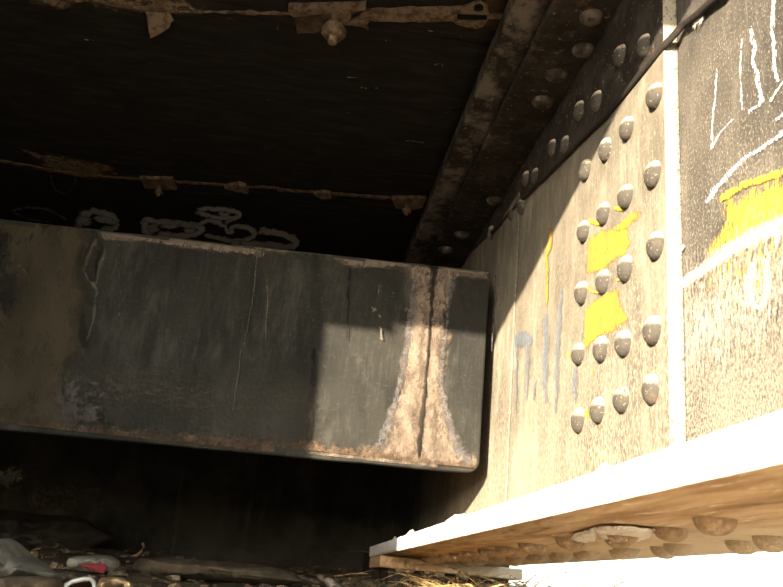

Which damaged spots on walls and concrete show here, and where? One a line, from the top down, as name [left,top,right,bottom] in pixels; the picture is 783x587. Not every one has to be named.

corrosion [33,0,206,14]
corrosion [21,149,119,179]
leakage [0,223,325,442]
corrosion [1,266,488,468]
leakage [330,257,423,449]
crack [417,265,439,457]
leakage [438,267,497,466]